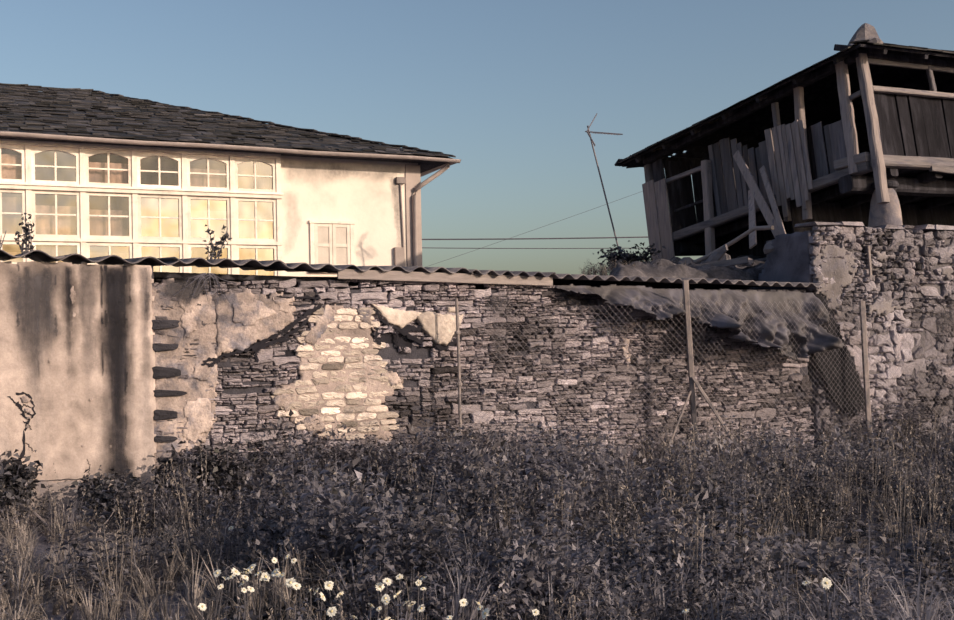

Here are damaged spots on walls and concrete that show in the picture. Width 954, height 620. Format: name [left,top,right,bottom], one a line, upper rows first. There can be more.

leakage [12,265,131,480]
peeling [152,277,296,471]
spalling [270,304,464,444]
peeling [810,241,860,338]
peeling [871,250,896,262]
peeling [866,296,907,315]